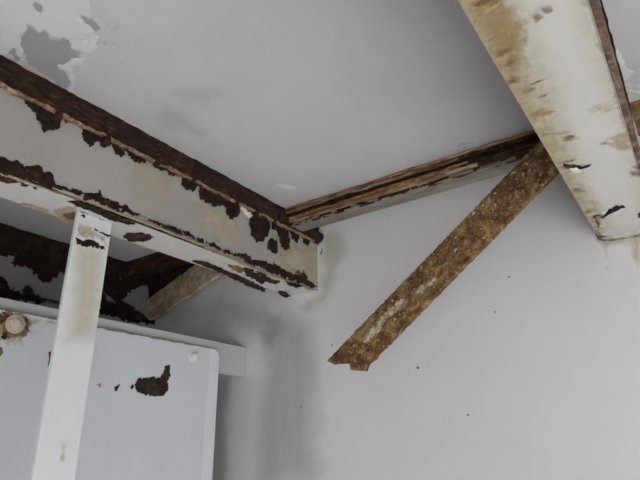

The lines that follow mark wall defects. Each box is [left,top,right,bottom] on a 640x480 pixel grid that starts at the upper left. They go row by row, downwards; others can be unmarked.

peeling [0,0,100,96]
peeling [563,164,591,173]
corrosion [0,157,317,325]
peeling [105,285,150,318]
corrosion [0,308,30,340]